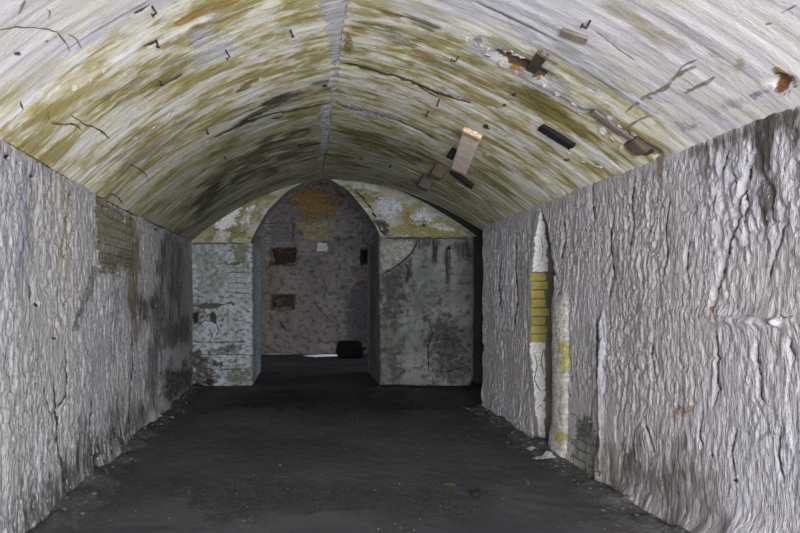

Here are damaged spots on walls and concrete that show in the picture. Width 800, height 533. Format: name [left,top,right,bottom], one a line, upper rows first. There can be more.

crack [0,26,82,52]
crack [41,112,110,139]
crack [338,4,538,122]
spalling [465,37,560,96]
spalling [772,67,797,97]
crack [353,189,464,282]
leakage [139,234,251,410]
leakage [379,237,474,384]